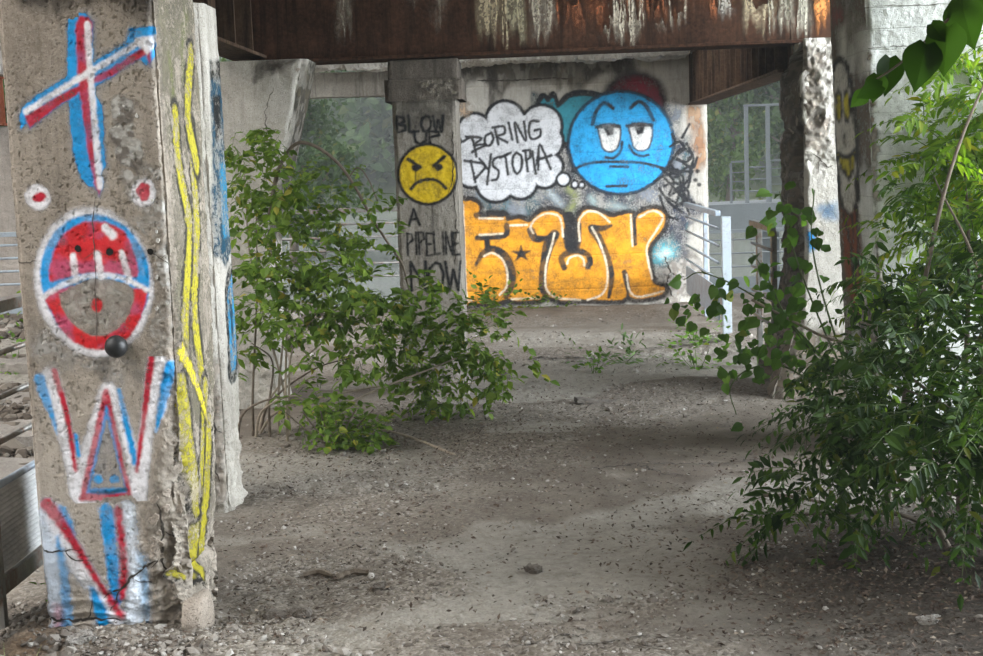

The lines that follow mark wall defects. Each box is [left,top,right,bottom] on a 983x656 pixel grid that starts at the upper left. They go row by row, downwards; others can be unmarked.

corrosion [814,0,830,21]
spalling [777,46,830,315]
crack [44,503,174,622]